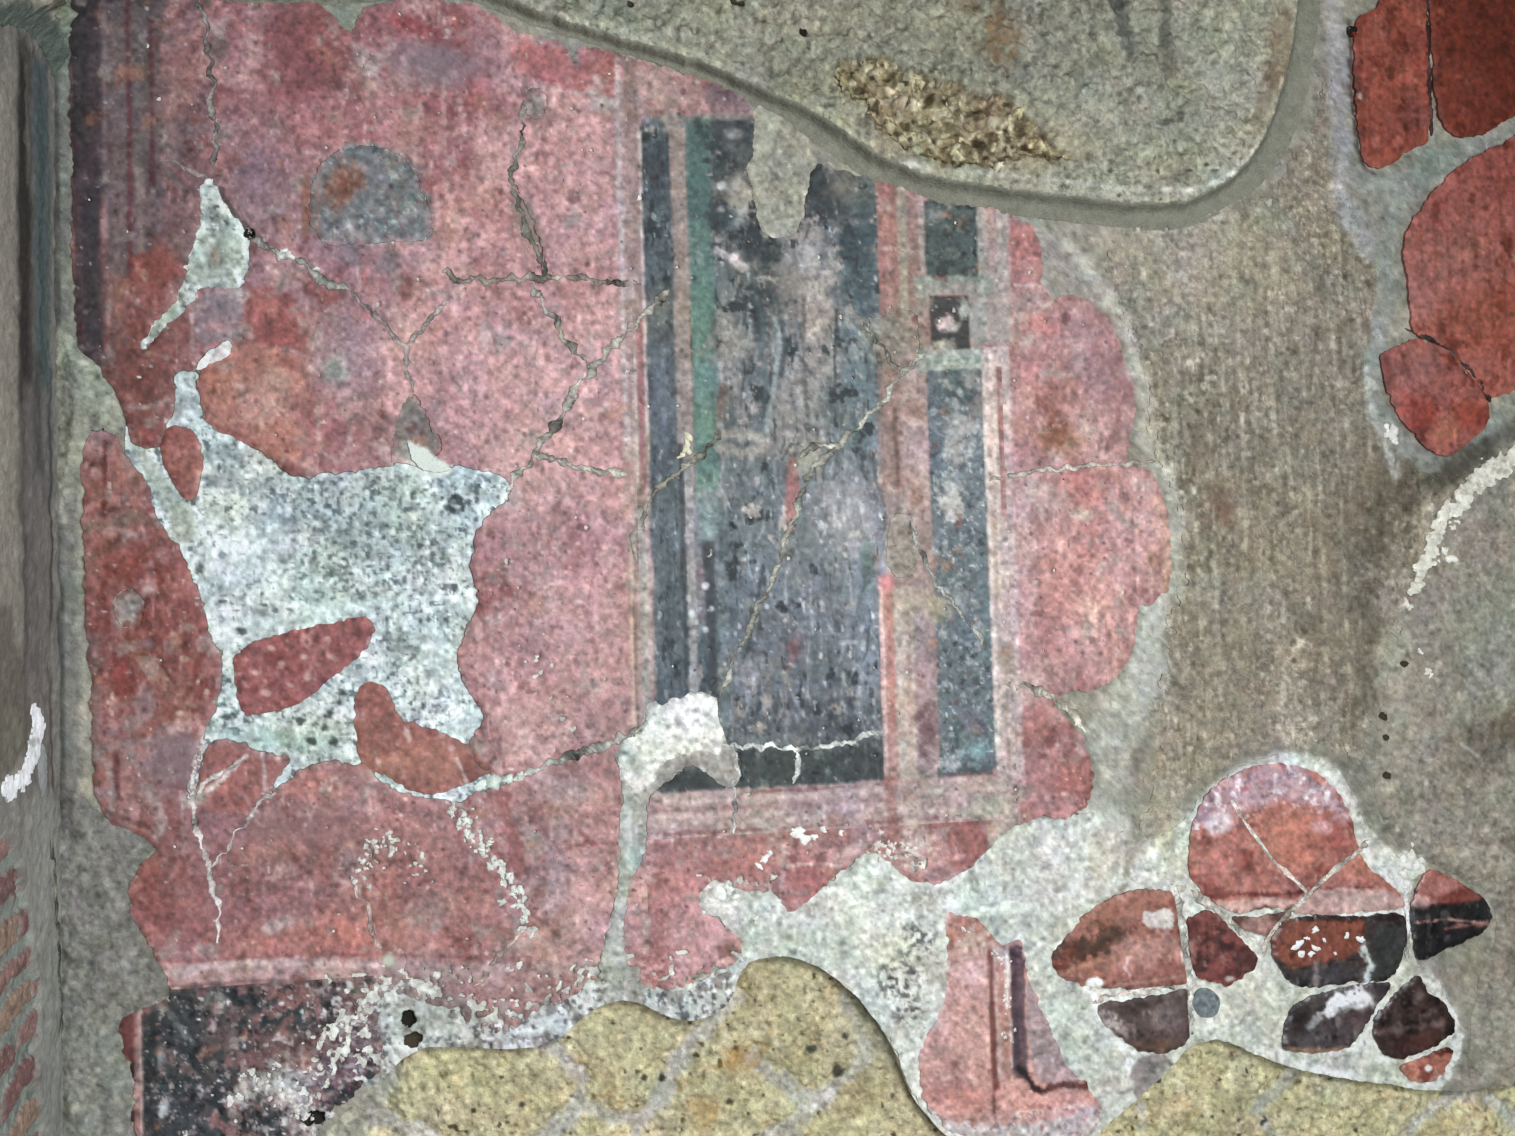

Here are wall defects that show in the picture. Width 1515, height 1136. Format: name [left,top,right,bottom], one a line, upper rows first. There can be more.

flaking render [141,179,251,349]
peeling [306,145,433,246]
crack [246,100,722,562]
spalling [835,56,1066,173]
crack [719,321,927,696]
leakage [1406,440,1515,596]
flaking render [125,340,534,939]
crack [187,736,276,943]
crack [722,729,886,833]
peeling [790,826,845,846]
crack [1090,803,1370,1035]
peeling [1291,926,1365,958]